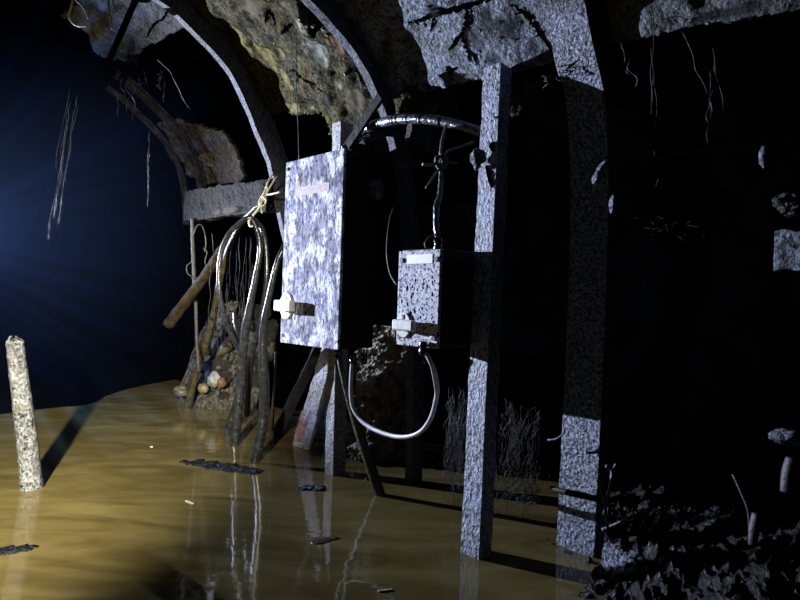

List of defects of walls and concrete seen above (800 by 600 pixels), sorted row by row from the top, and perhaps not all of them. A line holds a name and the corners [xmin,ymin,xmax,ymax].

spalling [296,17,329,37]
crack [408,0,492,80]
crack [511,3,554,58]